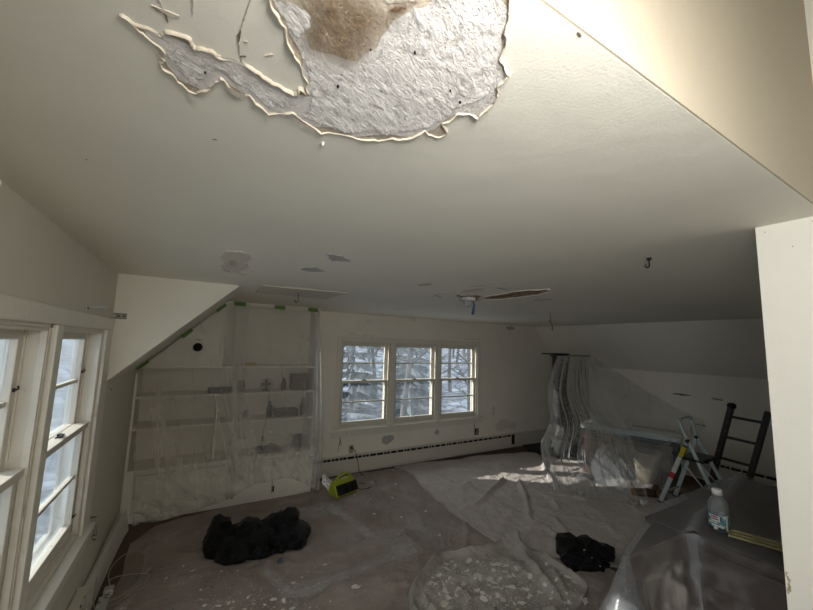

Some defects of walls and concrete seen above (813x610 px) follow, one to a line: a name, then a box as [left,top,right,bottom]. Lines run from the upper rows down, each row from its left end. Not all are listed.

crack [237,0,274,60]
flaking render [119,0,512,142]